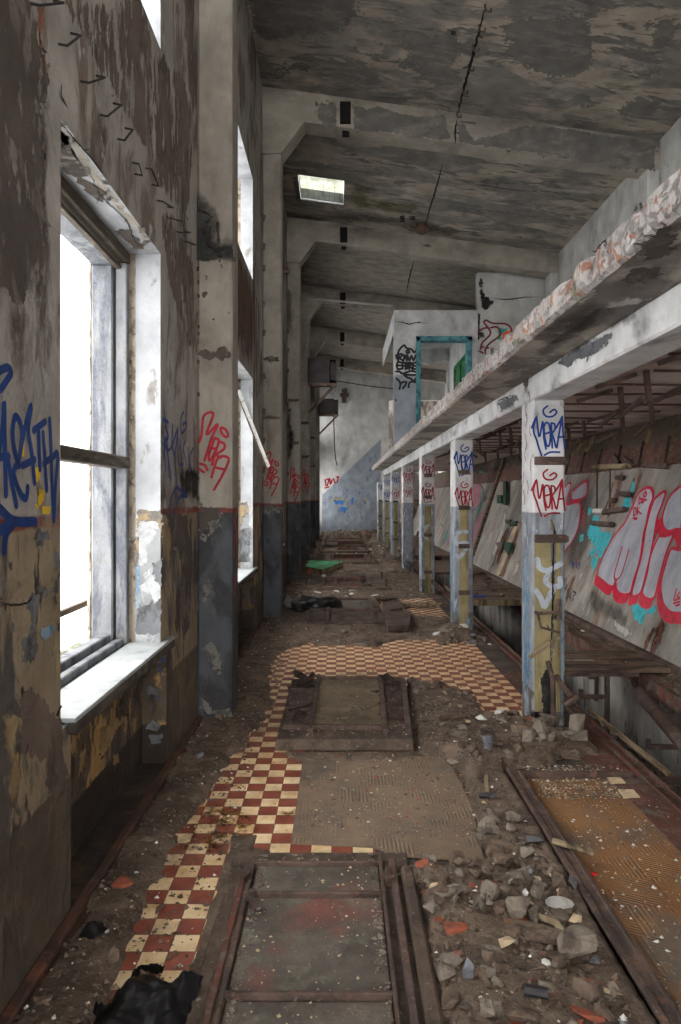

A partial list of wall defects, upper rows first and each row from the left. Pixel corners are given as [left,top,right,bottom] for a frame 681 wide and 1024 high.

crack [425,1,487,226]
peeling [61,0,232,364]
water stain [197,197,235,271]
water stain [353,184,416,223]
peeling [618,225,681,289]
peeling [558,333,613,368]
peeling [497,377,529,411]
peeling [133,506,223,640]
peeling [10,685,163,825]